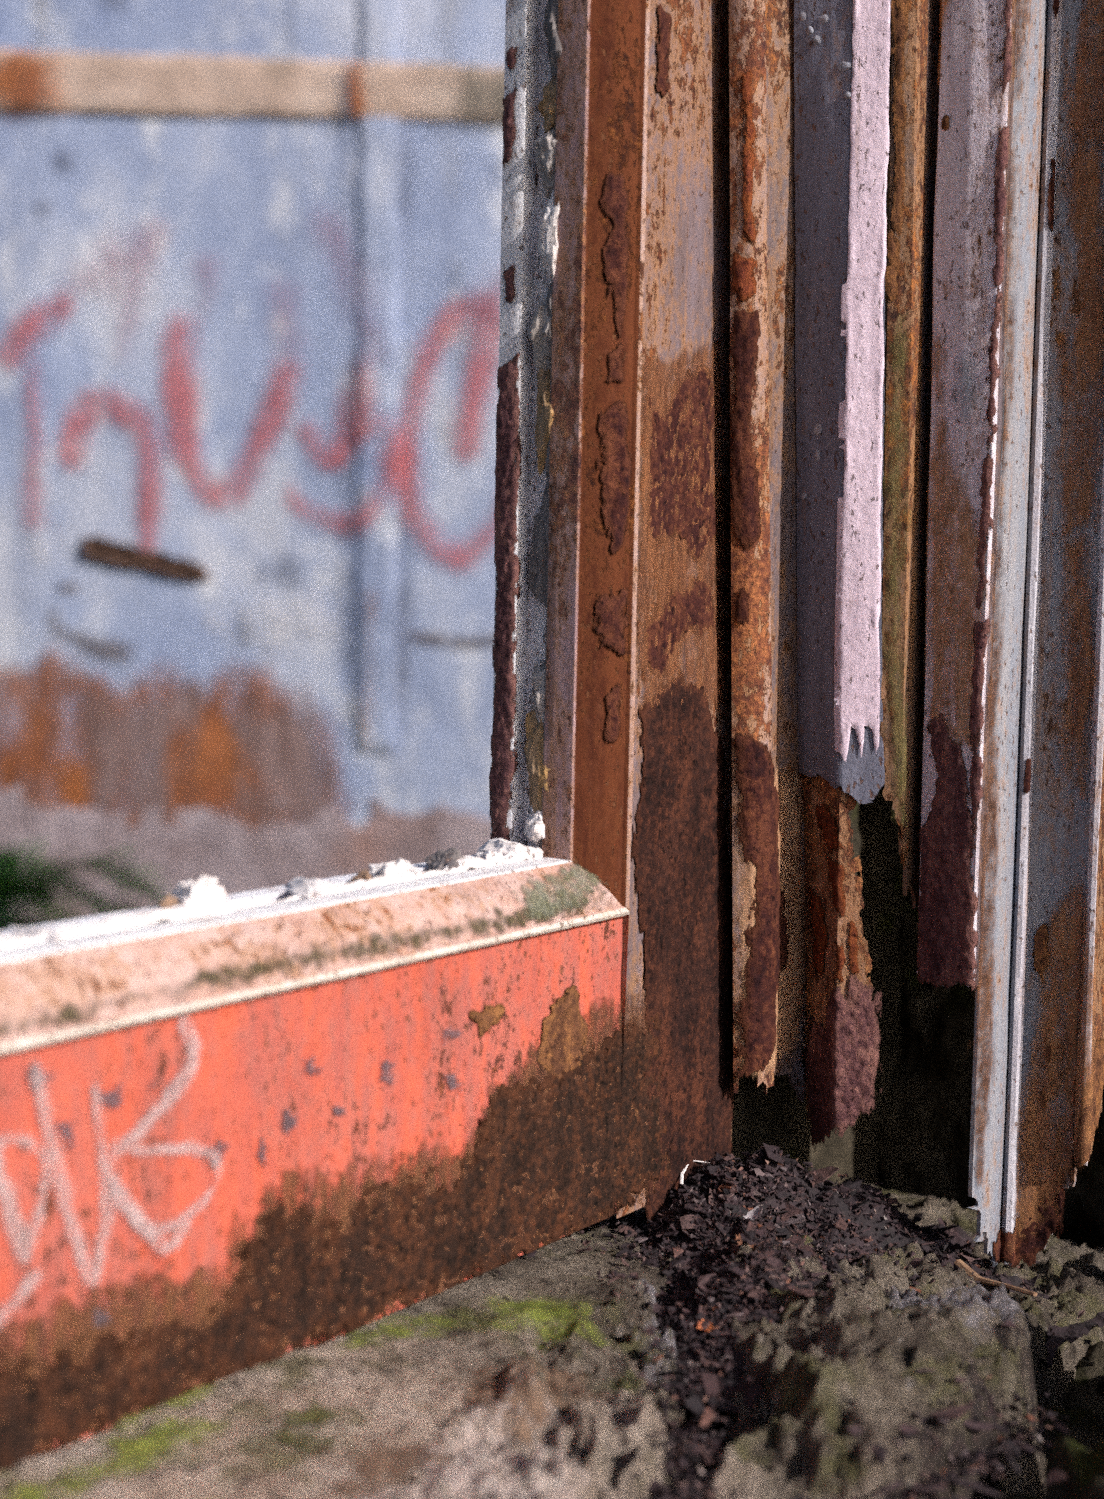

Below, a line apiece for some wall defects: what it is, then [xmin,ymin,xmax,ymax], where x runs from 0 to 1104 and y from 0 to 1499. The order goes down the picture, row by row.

corrosion [506,46,518,70]
peeling [799,12,828,46]
corrosion [1001,0,1028,95]
peeling [813,0,890,762]
corrosion [0,65,882,1458]
corrosion [1023,758,1031,794]
peeling [96,1083,123,1109]
peeling [282,1109,298,1135]
peeling [379,1060,396,1085]
corrosion [992,886,1104,1268]
damp [466,1358,597,1445]
damp [337,1444,449,1496]